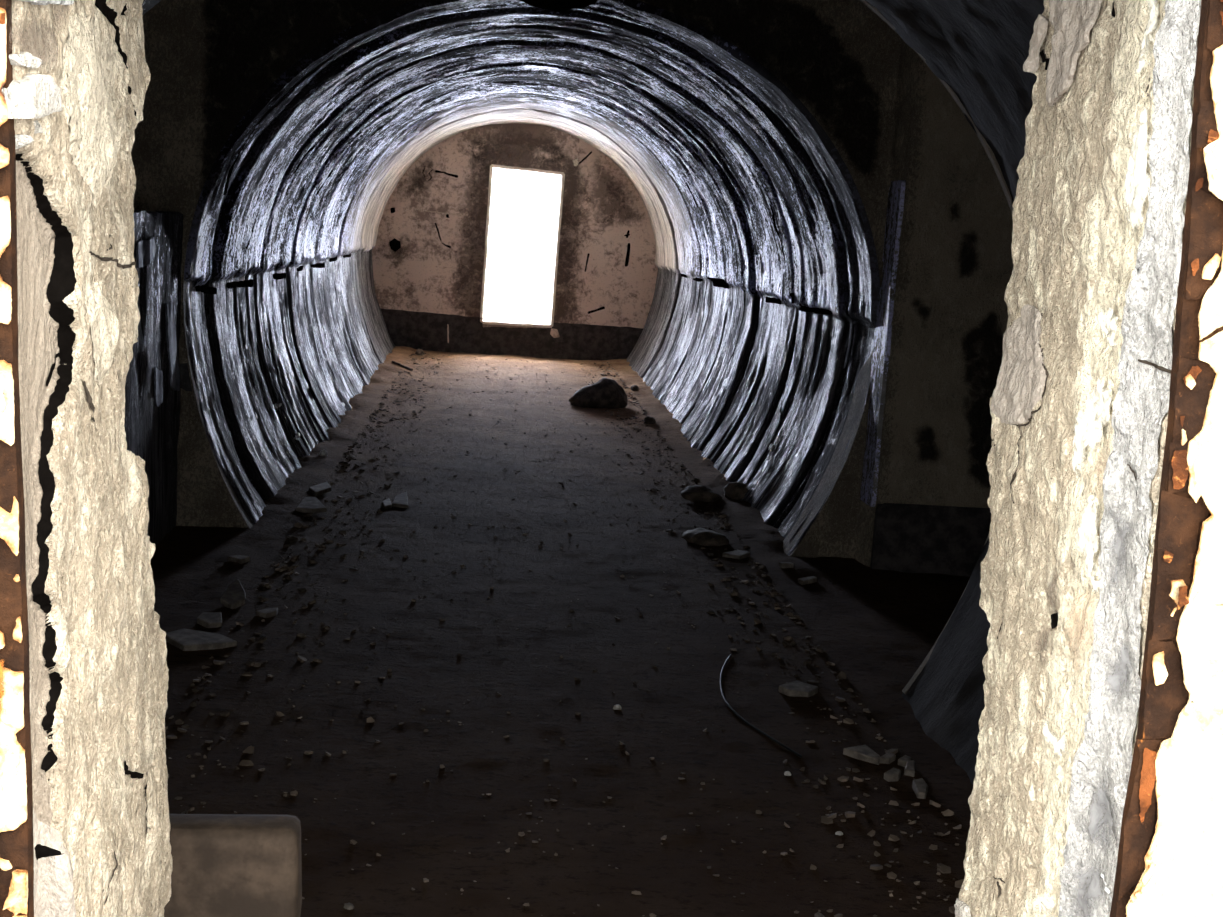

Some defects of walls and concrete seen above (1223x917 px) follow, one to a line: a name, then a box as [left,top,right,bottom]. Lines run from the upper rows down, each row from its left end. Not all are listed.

crack [95,0,136,116]
corrosion [0,242,12,288]
corrosion [0,321,13,364]
corrosion [0,440,18,515]
crack [16,154,136,781]
corrosion [0,538,24,720]
corrosion [1118,358,1216,904]
corrosion [16,725,25,749]